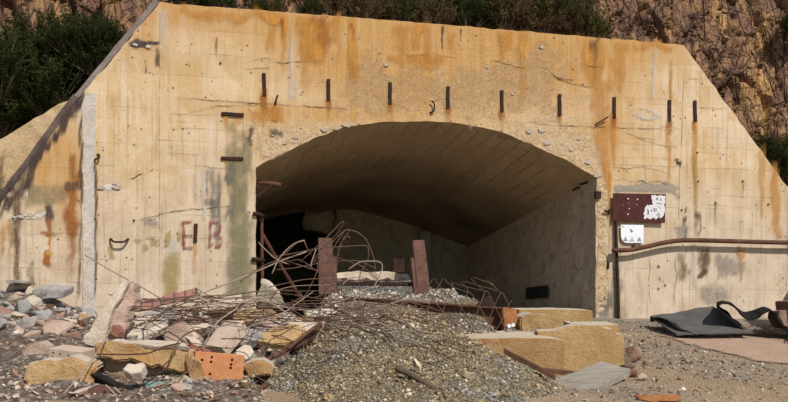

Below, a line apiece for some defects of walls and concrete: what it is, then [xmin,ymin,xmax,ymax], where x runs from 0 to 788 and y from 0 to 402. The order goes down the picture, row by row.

spalling [130,39,159,49]
rust [185,9,359,79]
rust [261,89,282,121]
rust [42,205,54,266]
rust [64,117,84,293]
leakage [201,128,253,298]
leakage [682,246,742,281]
rust [771,168,779,237]